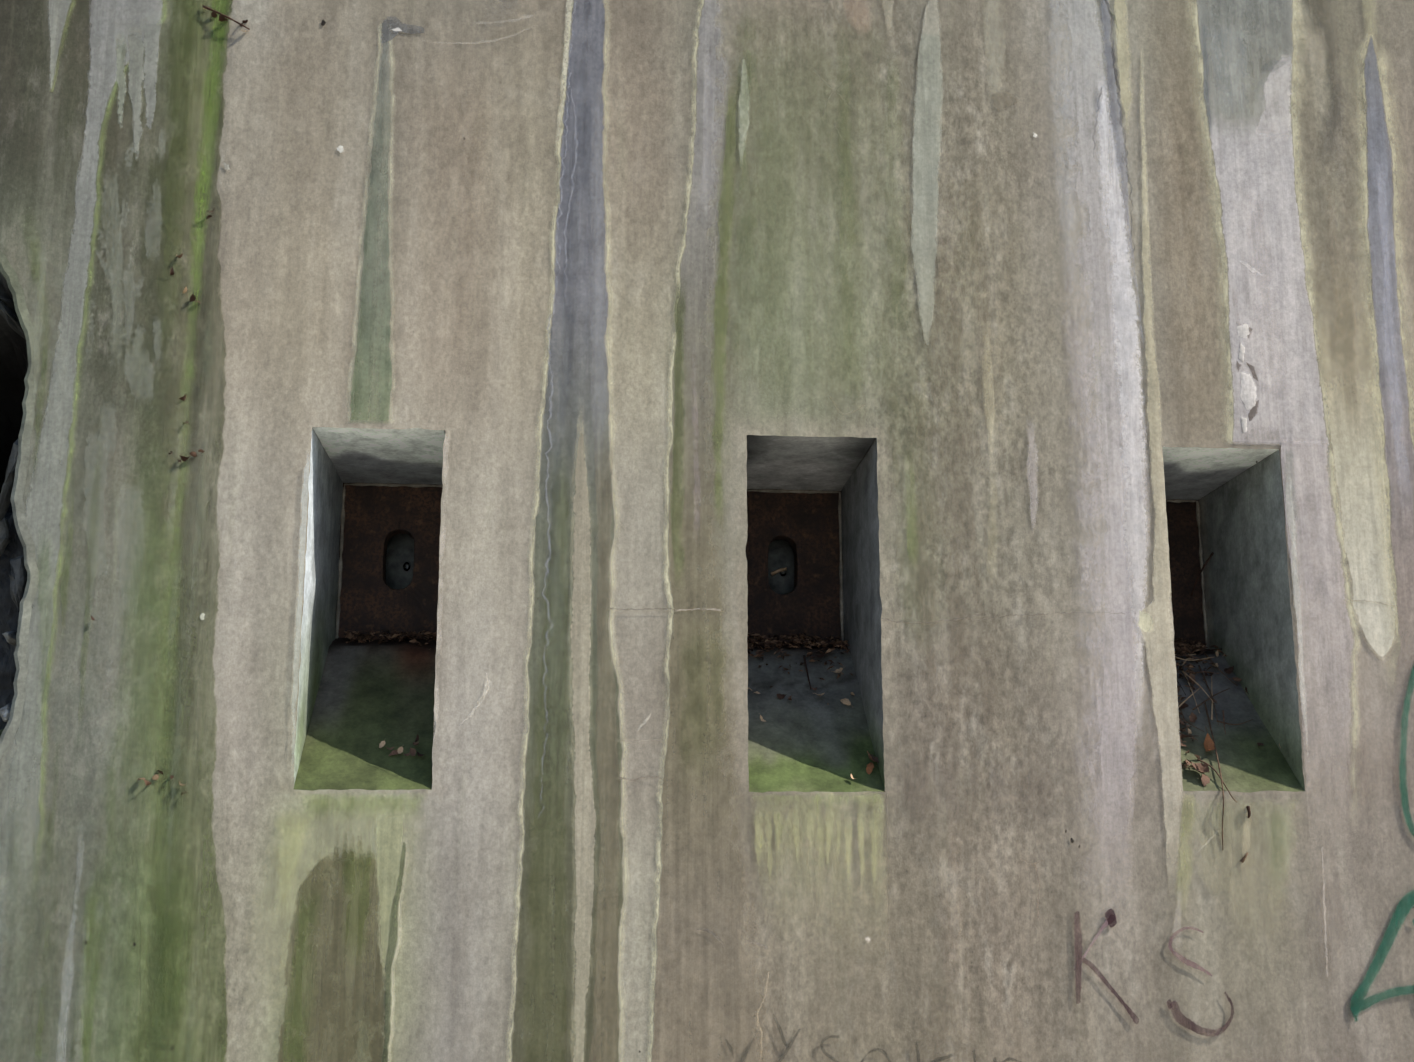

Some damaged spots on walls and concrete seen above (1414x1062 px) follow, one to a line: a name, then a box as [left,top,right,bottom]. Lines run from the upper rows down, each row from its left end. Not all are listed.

peeling [0,704,12,737]
peeling [3,631,17,645]
peeling [0,283,26,340]
peeling [0,439,27,612]
damp [4,0,163,824]
damp [350,17,424,421]
damp [509,0,626,1062]
damp [1362,34,1414,638]
damp [277,817,406,1062]